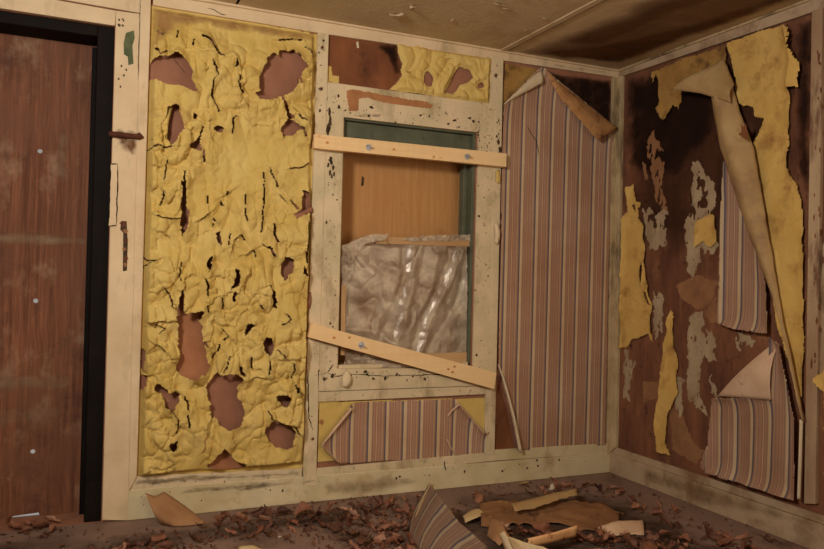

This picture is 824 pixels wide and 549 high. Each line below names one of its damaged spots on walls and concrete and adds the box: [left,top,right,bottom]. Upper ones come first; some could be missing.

peeling [445,67,483,94]
peeling [137,5,437,476]
peeling [676,275,718,323]